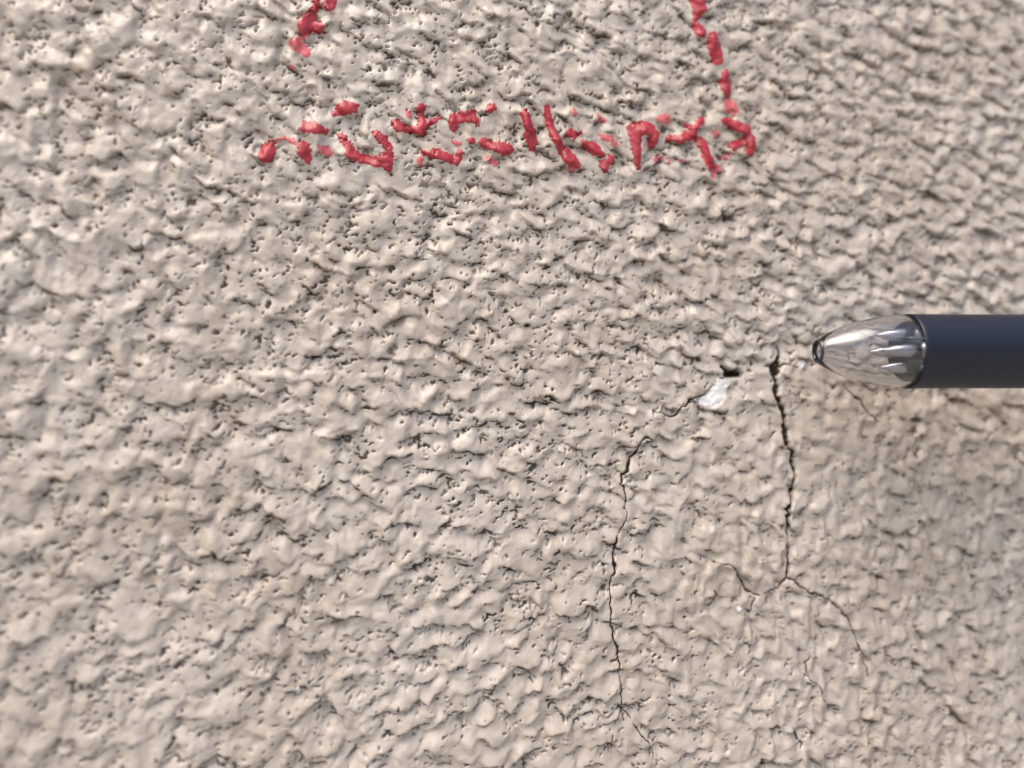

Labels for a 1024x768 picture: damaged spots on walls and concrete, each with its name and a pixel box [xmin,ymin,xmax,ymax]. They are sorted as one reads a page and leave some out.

crack [607,371,726,757]
crack [698,347,869,678]
crack [804,656,826,702]
crack [843,383,885,422]